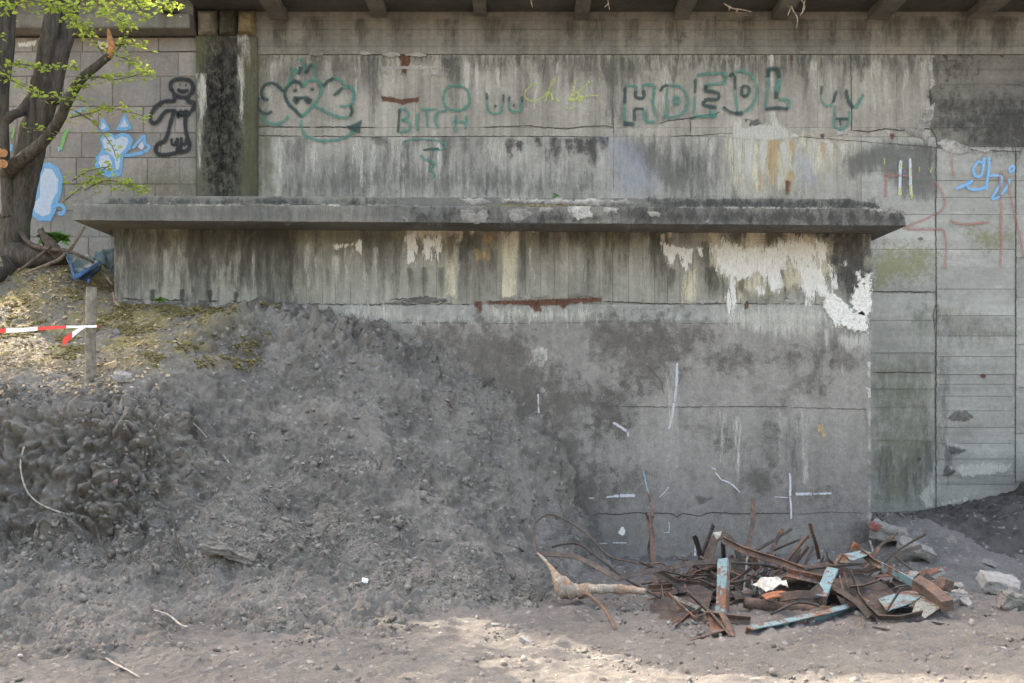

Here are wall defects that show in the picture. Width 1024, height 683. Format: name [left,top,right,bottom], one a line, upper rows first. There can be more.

leakage [195,35,250,204]
leakage [256,140,307,204]
leakage [352,138,376,186]
leakage [489,111,902,372]
leakage [332,248,378,292]
leakage [321,305,472,326]
corrosion [475,297,602,313]
peeling [660,237,873,524]
crack [589,510,862,518]